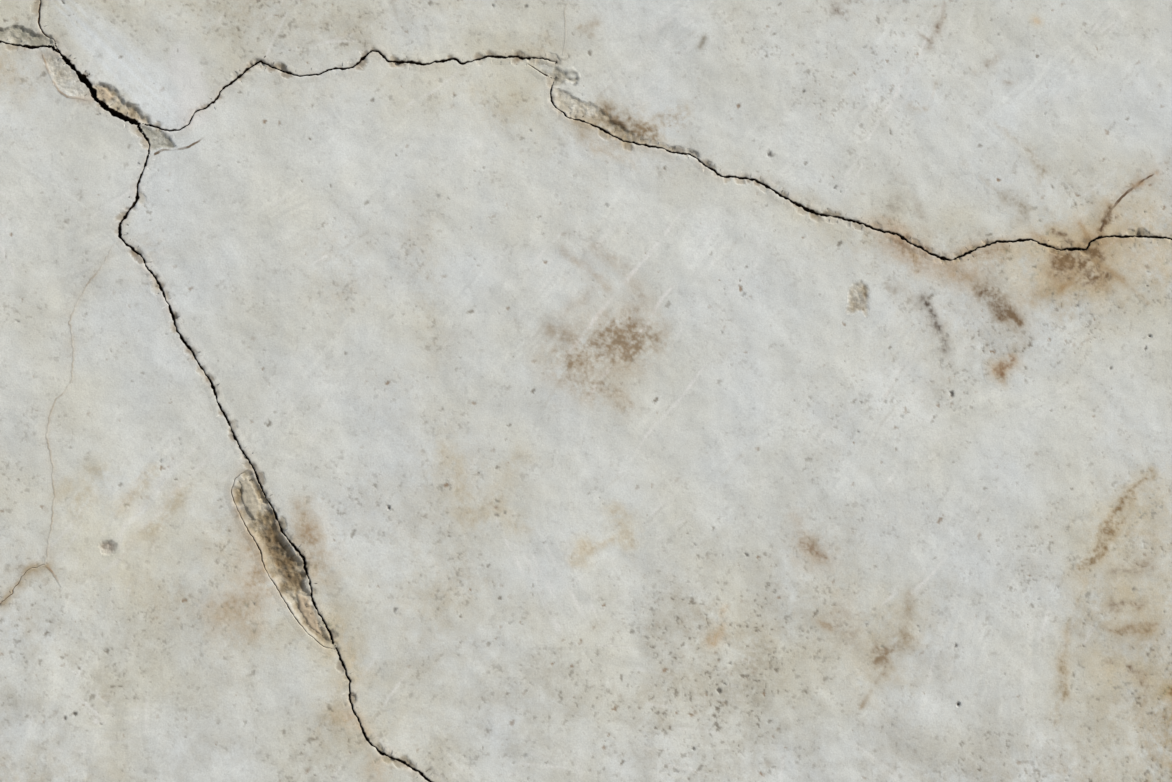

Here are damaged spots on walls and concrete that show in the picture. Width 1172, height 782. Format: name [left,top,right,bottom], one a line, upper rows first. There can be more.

crack [0,0,1172,267]
crack [0,122,442,782]
spalling [224,463,337,656]